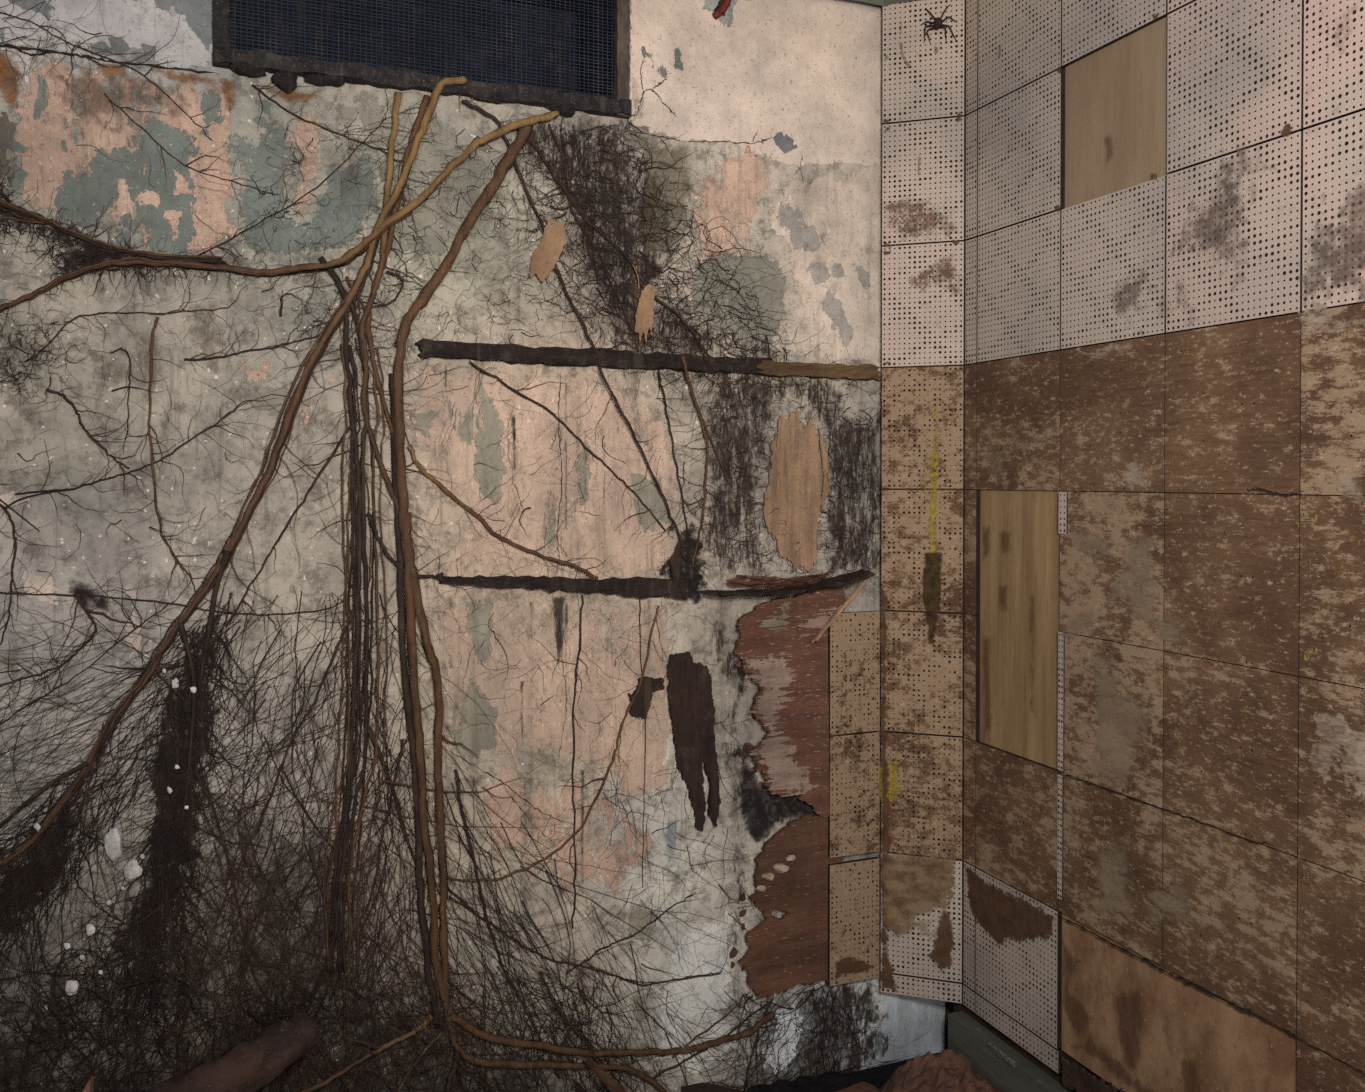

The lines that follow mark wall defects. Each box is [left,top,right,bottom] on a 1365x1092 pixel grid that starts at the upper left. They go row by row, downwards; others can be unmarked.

peeling [0,0,494,262]
leakage [501,121,777,358]
peeling [629,0,883,373]
leakage [887,202,953,235]
mould [1179,150,1247,259]
mould [1304,192,1365,297]
leakage [116,605,225,950]
leakage [553,597,568,660]
leakage [714,621,818,842]
leakage [658,372,882,604]
leakage [797,585,1054,1076]
leakage [922,398,942,644]